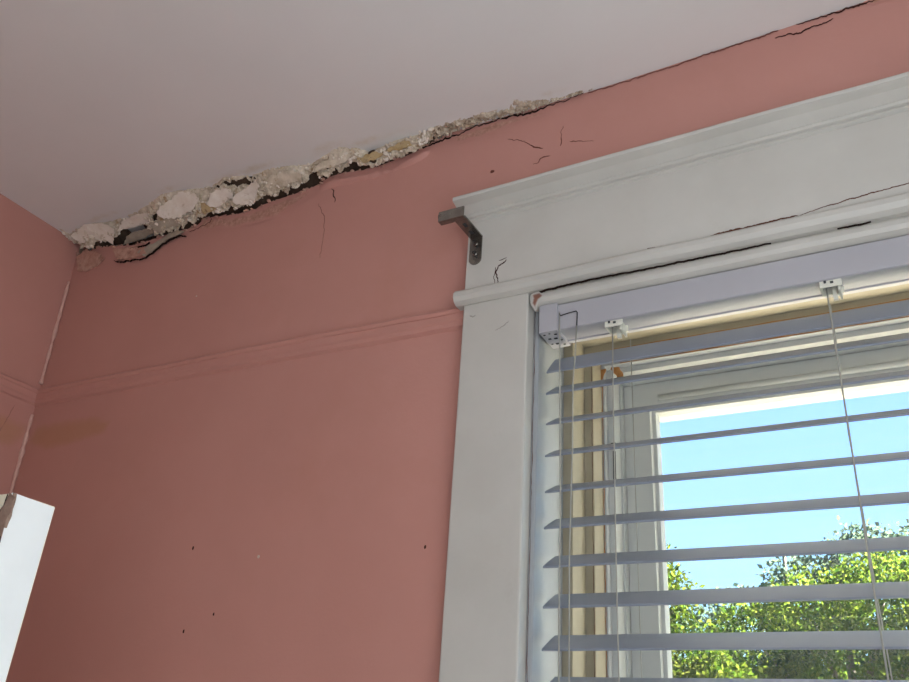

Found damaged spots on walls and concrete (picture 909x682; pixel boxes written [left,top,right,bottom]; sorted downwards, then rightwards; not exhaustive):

crack [588,0,874,93]
spalling [61,89,593,272]
crack [510,127,592,164]
crack [114,218,212,263]